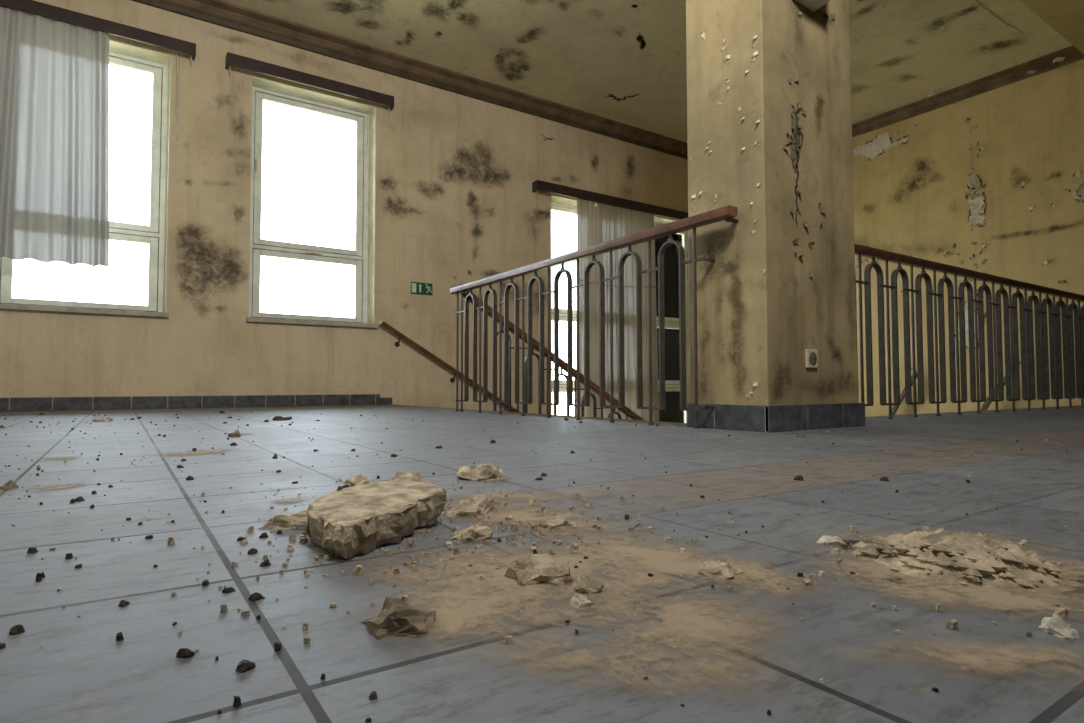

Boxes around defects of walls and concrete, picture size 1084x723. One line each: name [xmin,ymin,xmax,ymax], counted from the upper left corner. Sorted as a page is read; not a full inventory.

water stain [333,0,376,28]
water stain [424,0,476,24]
peeling [853,121,919,160]
water stain [446,145,509,183]
crack [785,103,803,225]
water stain [178,226,241,294]
peeling [937,143,991,349]